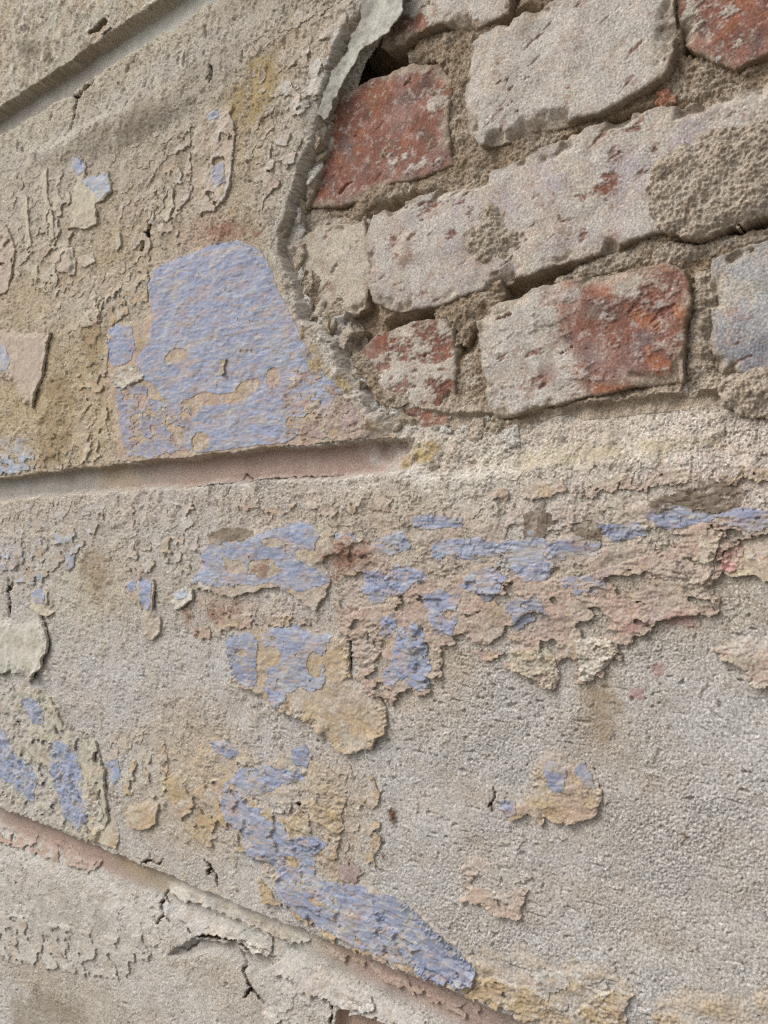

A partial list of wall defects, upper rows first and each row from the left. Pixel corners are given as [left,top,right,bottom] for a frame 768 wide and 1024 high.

spalling [0,0,768,475]
crack [206,862,218,885]
crack [157,890,274,1003]
peeling [0,452,768,1024]